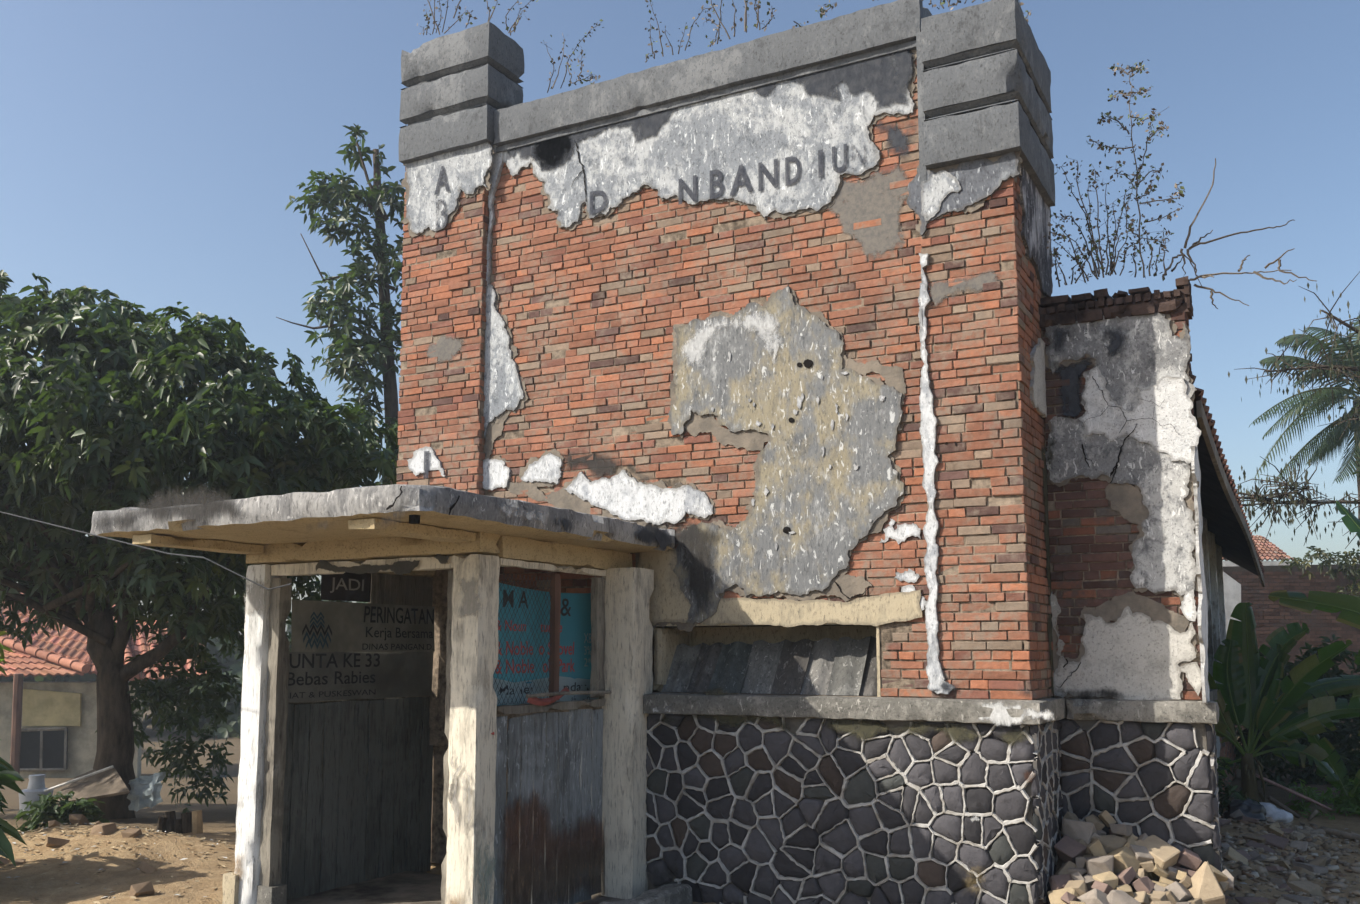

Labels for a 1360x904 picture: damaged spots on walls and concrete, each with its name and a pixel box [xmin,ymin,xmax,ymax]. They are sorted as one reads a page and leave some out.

flaking render [407,446,447,477]
flaking render [401,49,917,438]
flaking render [482,151,1053,694]
flaking render [1029,313,1210,704]
crack [1082,376,1183,483]
water stain [504,846,605,904]